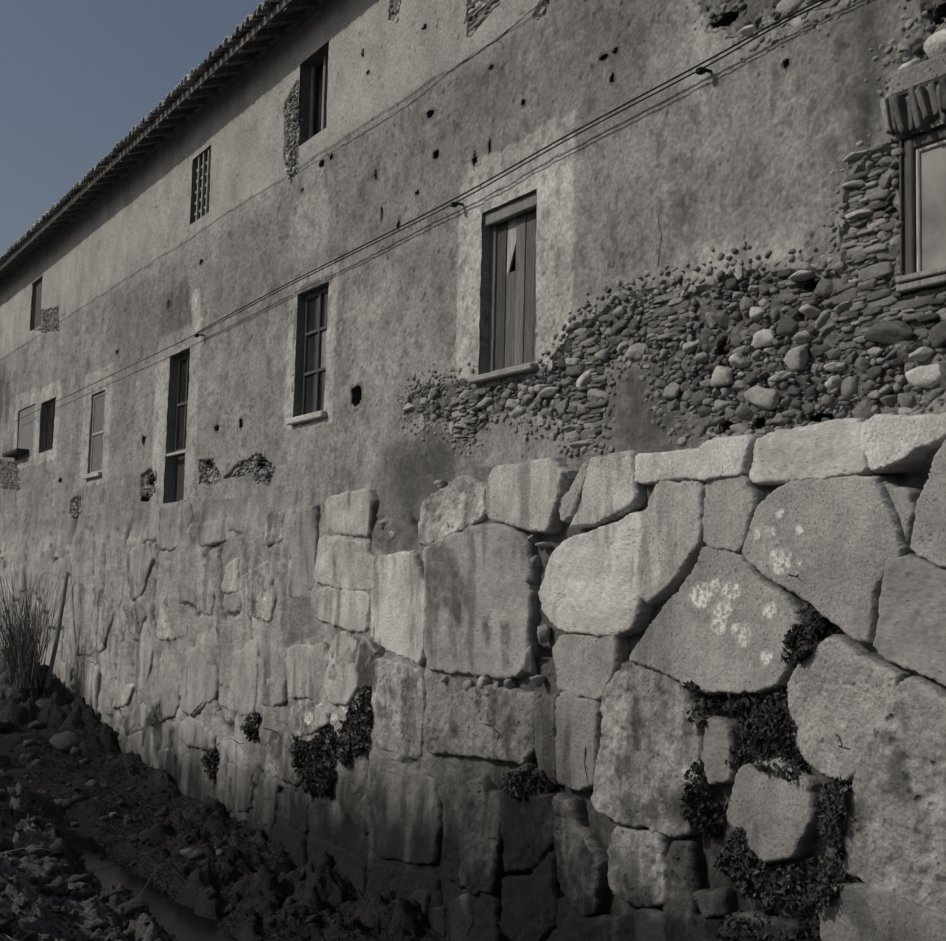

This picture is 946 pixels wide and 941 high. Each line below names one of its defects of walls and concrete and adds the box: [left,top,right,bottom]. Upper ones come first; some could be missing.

spalling [386,0,401,23]
spalling [462,0,501,37]
spalling [532,0,552,22]
spalling [685,0,871,63]
spalling [864,0,946,98]
spalling [282,80,303,182]
spalling [396,124,946,457]
spalling [30,305,59,334]
spalling [0,459,21,491]
spalling [139,468,157,500]
spalling [197,450,275,486]